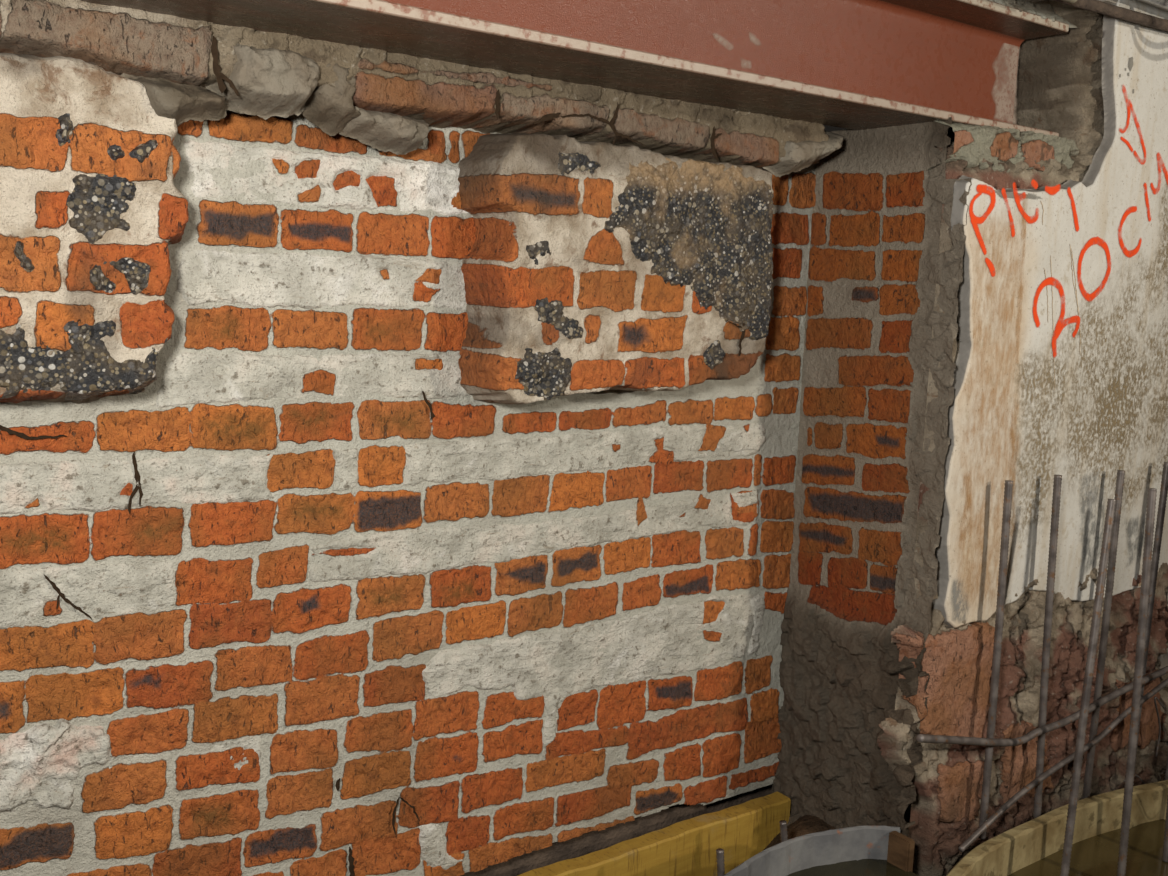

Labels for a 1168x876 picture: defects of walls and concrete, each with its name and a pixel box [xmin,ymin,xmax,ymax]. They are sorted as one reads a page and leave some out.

damp [1019,192,1168,567]
crack [0,425,67,440]
crack [128,451,143,514]
crack [44,575,92,620]
spalling [916,462,1168,876]
spalling [0,718,115,813]
spalling [716,848,725,876]